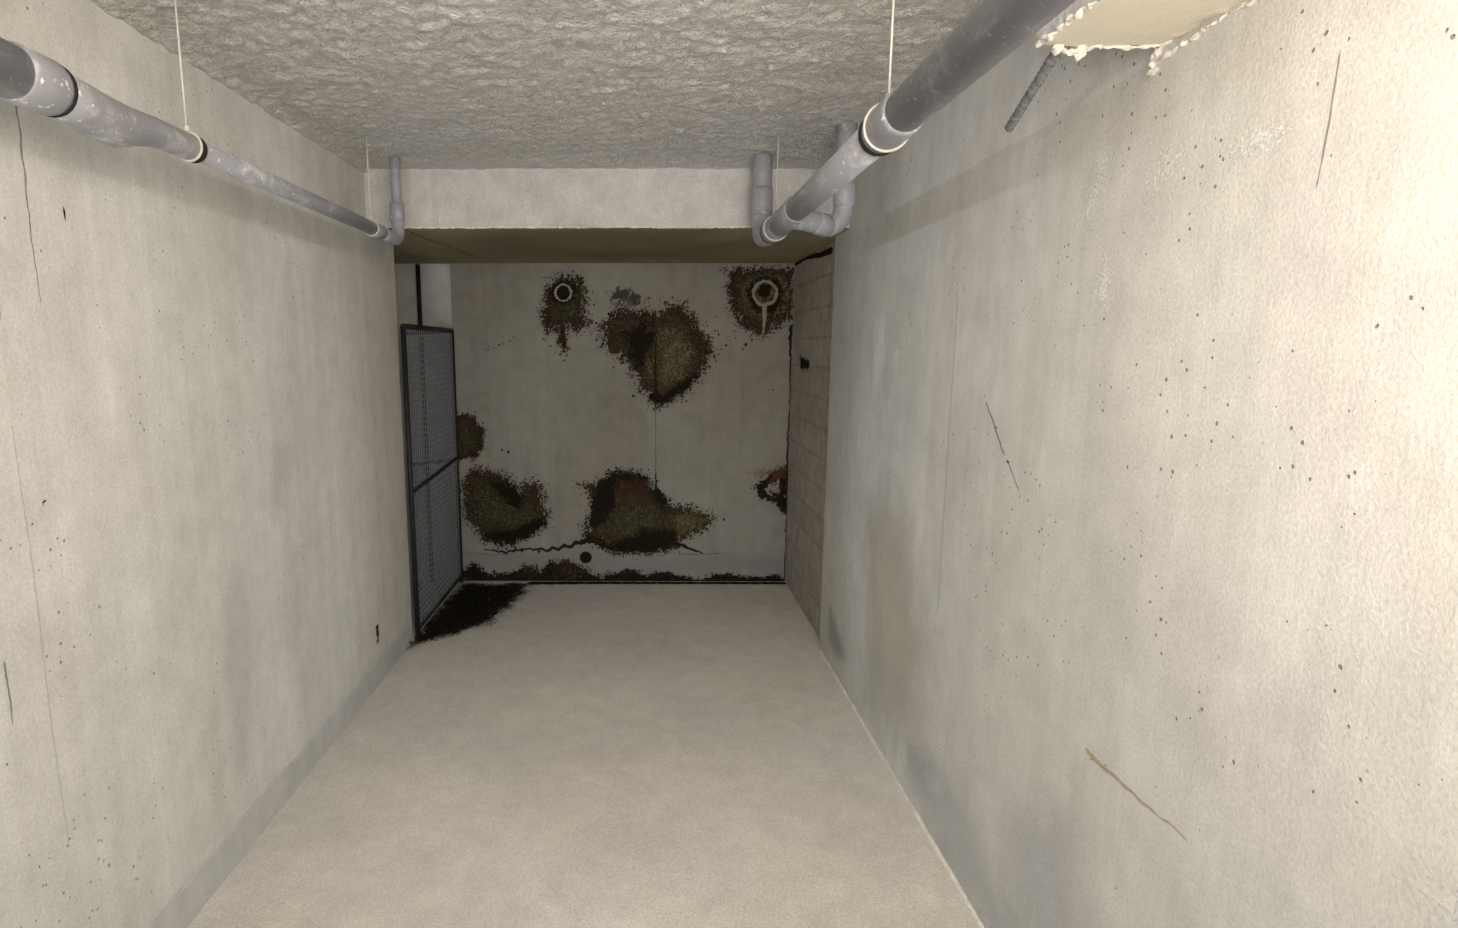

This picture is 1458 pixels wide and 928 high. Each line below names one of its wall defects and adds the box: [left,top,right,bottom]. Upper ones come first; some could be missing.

crack [651,330,659,507]
corrosion [750,462,789,515]
crack [463,538,719,556]